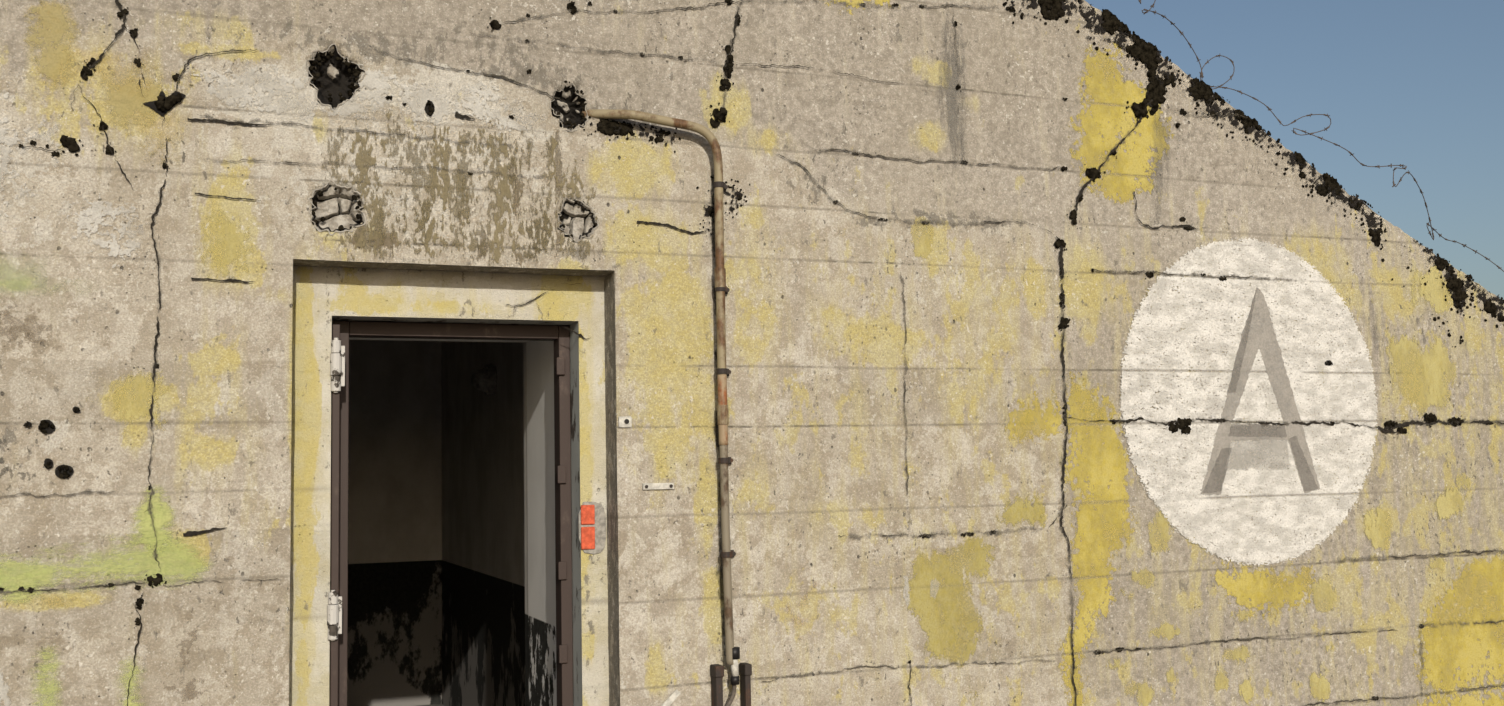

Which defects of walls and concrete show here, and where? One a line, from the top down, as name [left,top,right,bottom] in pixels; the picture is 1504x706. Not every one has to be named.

peeling [191,43,605,270]
crack [385,0,896,177]
crack [840,1,1016,112]
crack [0,0,481,706]
crack [507,283,591,339]
crack [762,100,1504,706]